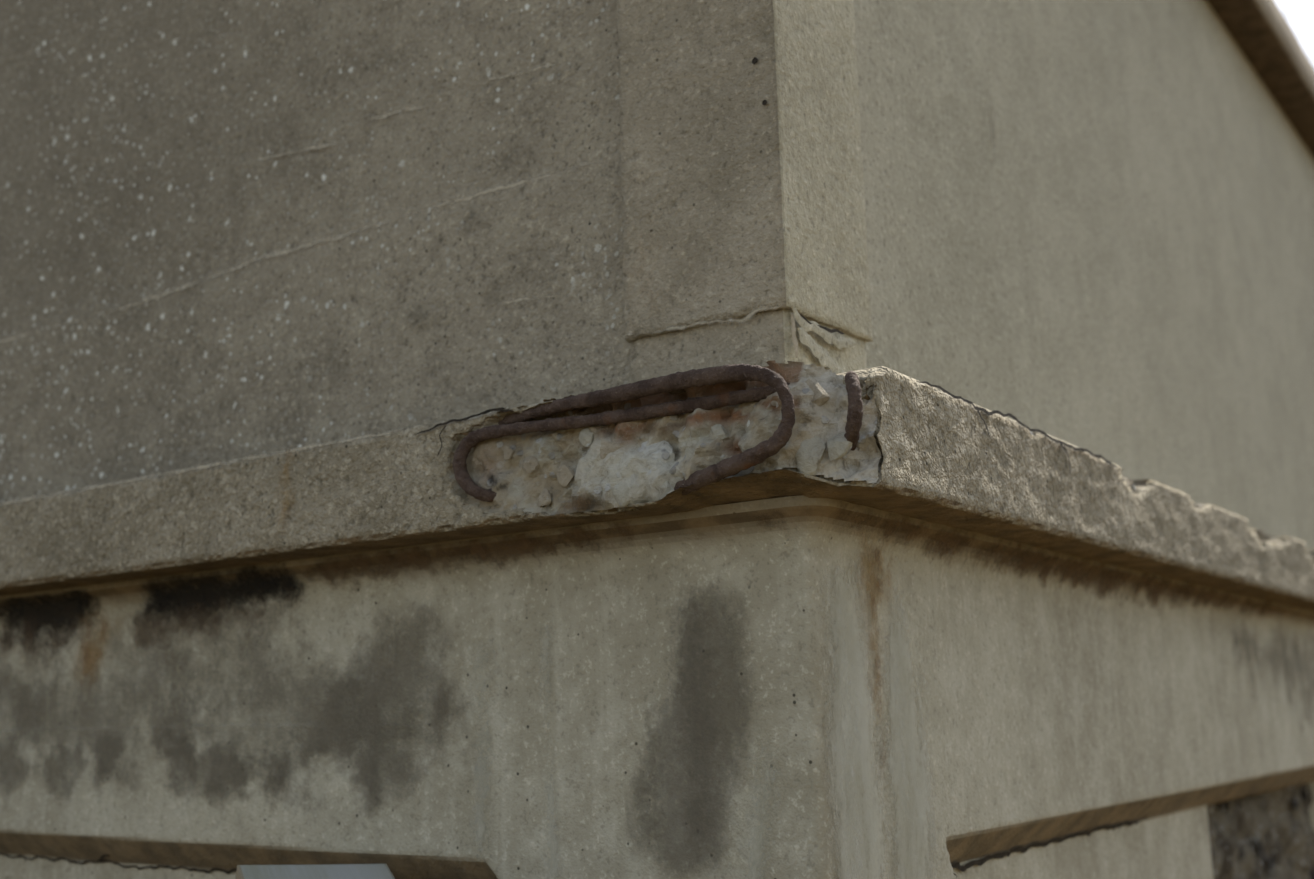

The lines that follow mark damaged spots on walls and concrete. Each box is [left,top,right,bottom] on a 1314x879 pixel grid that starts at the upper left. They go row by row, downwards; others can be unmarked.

spalling [449,306,881,515]
spalling [1122,476,1148,494]
water stain [0,590,98,651]
water stain [138,565,303,641]